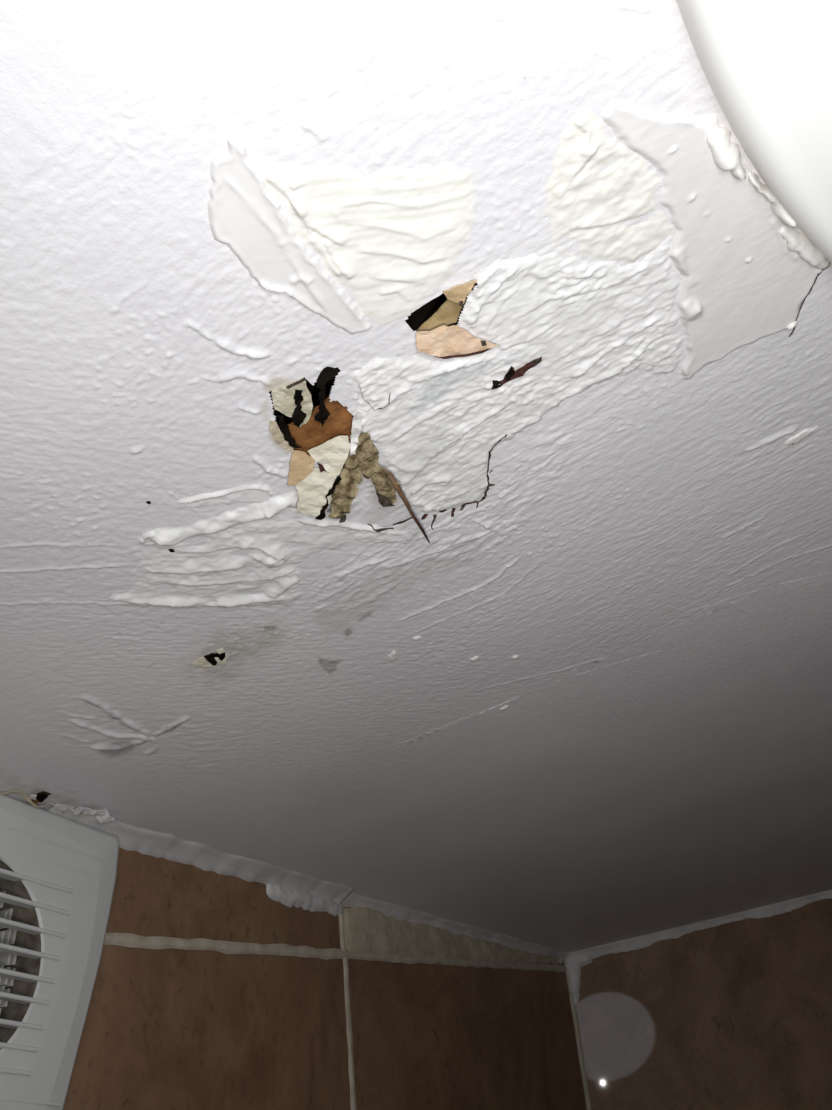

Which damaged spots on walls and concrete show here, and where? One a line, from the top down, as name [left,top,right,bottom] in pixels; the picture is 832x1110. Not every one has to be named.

spalling [405,280,498,359]
crack [786,270,823,337]
spalling [268,367,430,543]
crack [367,434,508,532]